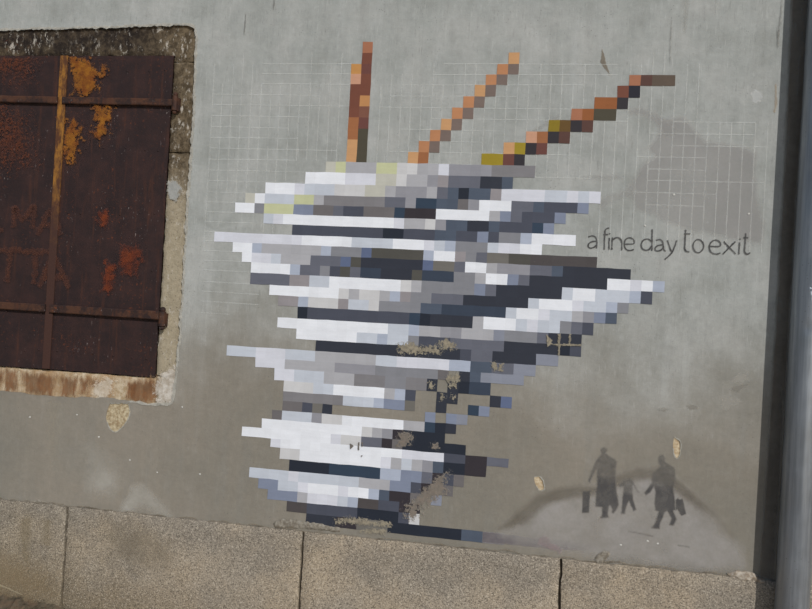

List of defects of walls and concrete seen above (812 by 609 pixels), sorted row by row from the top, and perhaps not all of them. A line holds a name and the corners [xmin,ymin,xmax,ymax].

corrosion [67,56,109,97]
corrosion [62,104,116,165]
peeling [397,338,457,356]
peeling [546,333,581,355]
corrosion [0,369,99,397]
corrosion [126,379,157,403]
peeling [427,373,461,400]
spalling [106,403,131,433]
spalling [673,437,682,459]
peeling [404,471,452,522]
spalling [534,476,545,491]